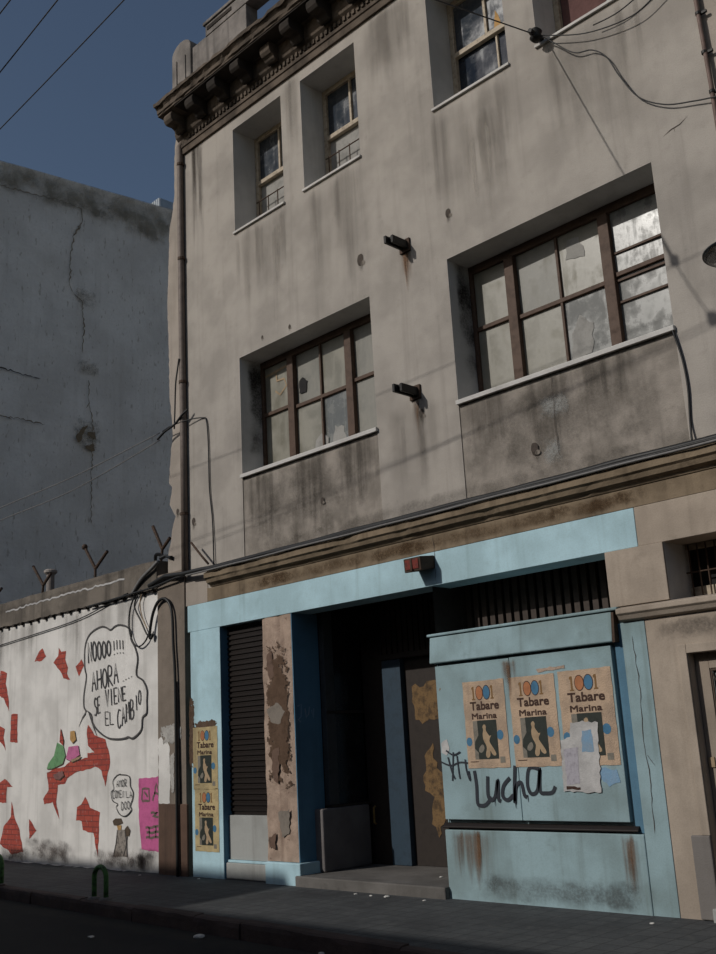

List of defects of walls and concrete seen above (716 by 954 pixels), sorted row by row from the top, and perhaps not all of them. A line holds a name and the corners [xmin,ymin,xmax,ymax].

leakage [1,161,172,235]
flaking render [76,425,96,452]
flaking render [265,642,293,789]
flaking render [268,810,290,849]